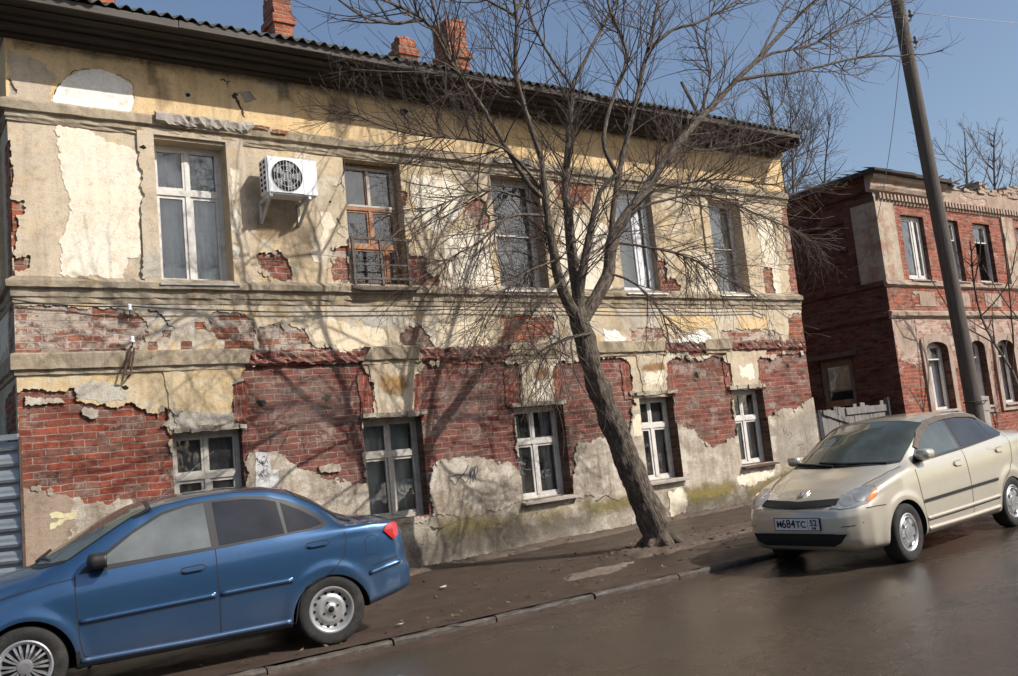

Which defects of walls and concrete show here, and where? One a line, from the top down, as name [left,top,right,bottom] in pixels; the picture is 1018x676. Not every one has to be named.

peeling [55,125,148,278]
flaking render [256,249,292,282]
flaking render [310,199,350,284]
flaking render [6,382,175,505]
flaking render [147,330,171,350]
flaking render [224,340,373,485]
flaking render [399,358,594,547]
flaking render [553,360,604,484]
flaking render [600,357,636,429]
flaking render [666,351,736,448]
flaking render [758,342,812,417]